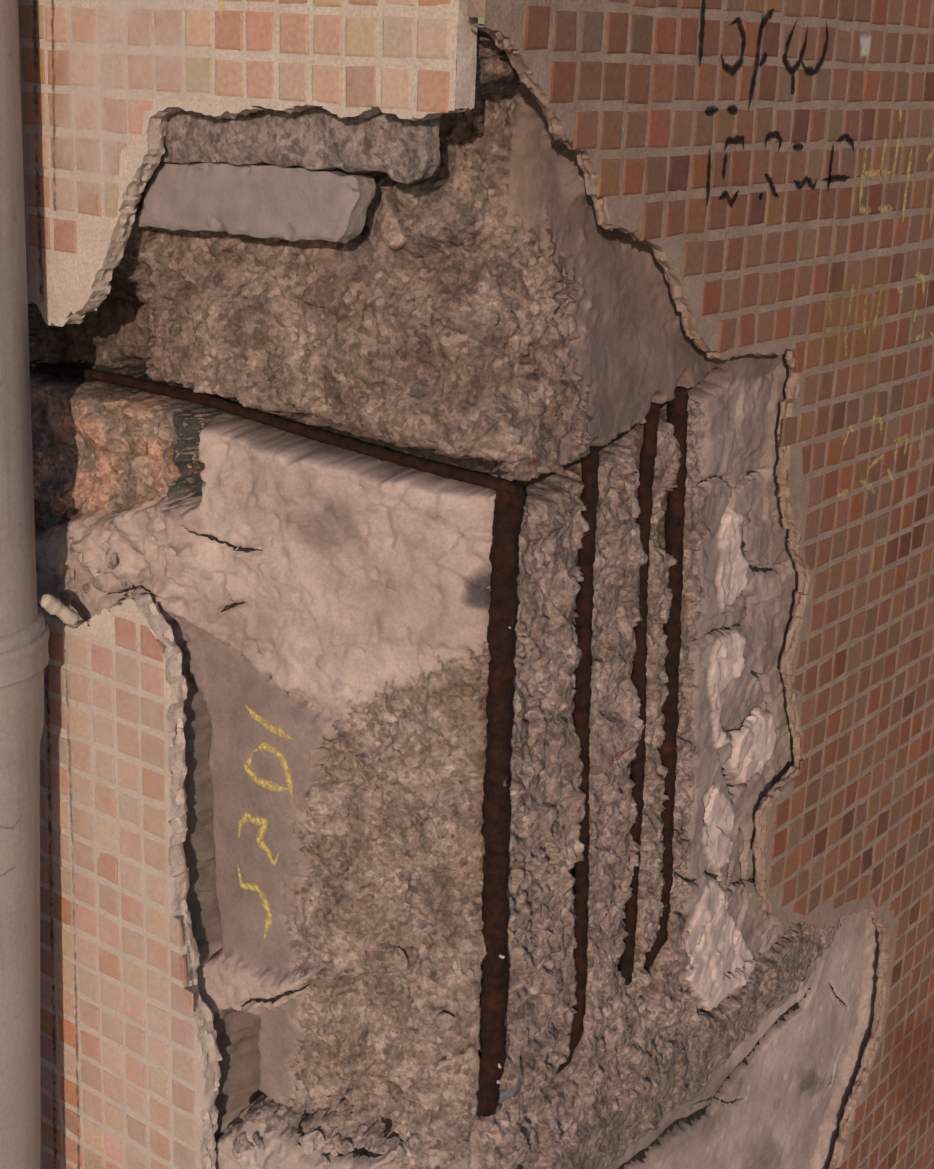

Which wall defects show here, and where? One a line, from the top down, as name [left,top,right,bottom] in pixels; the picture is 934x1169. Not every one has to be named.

spalling [28,24,593,537]
crack [692,470,760,488]
crack [185,528,262,553]
peeling [105,547,118,570]
crack [741,541,781,573]
peeling [57,567,90,608]
crack [687,624,740,642]
crack [725,670,761,732]
spalling [213,386,880,1169]
crack [679,870,755,885]
crack [617,982,847,1169]